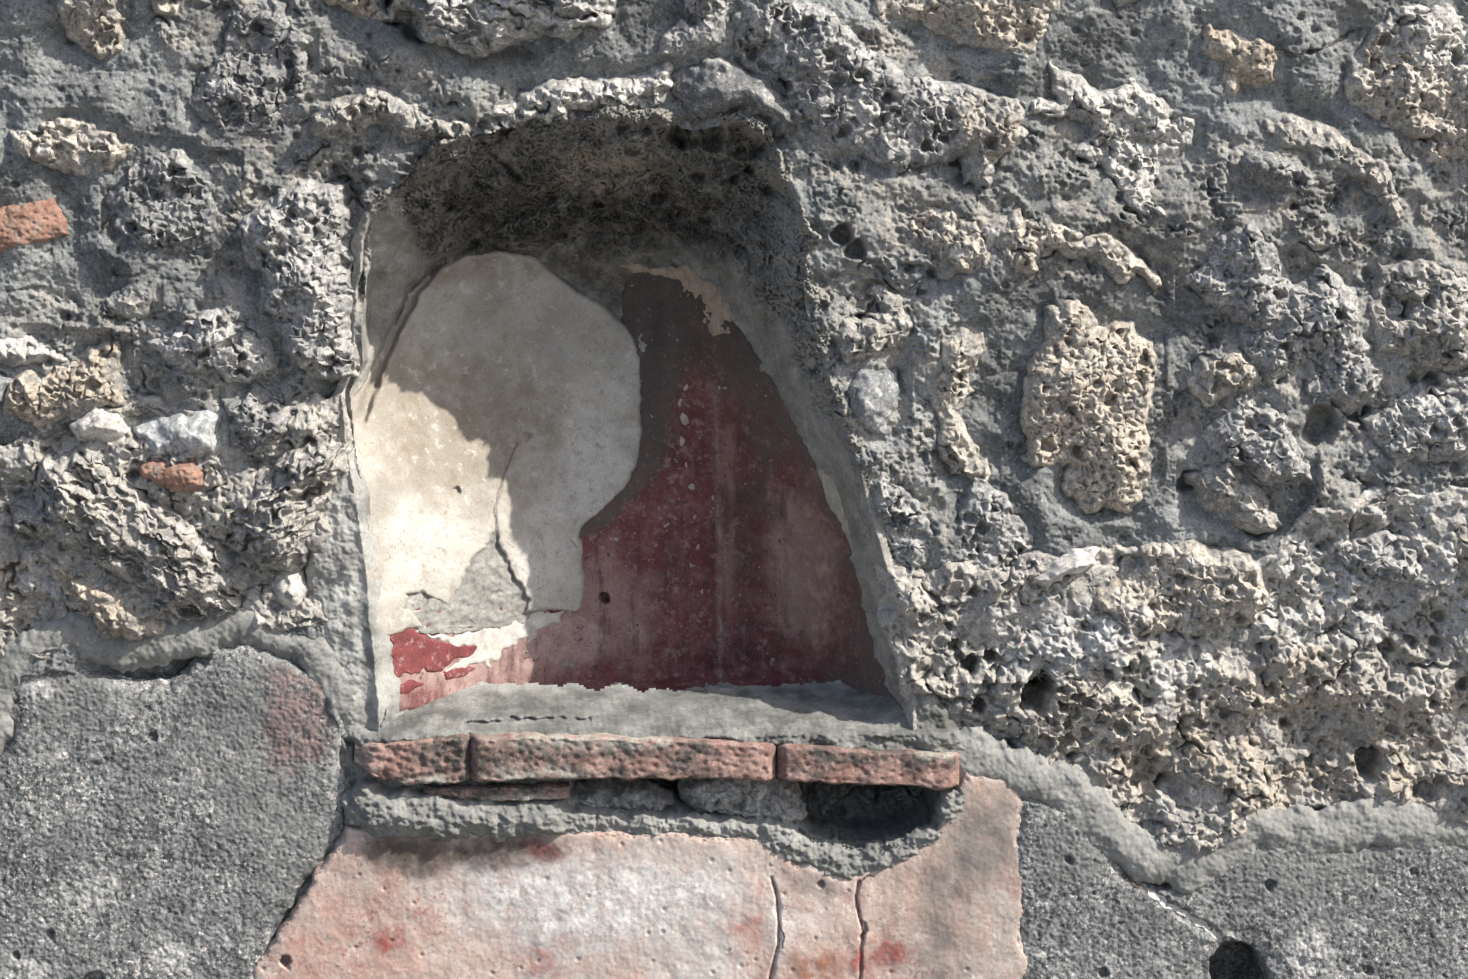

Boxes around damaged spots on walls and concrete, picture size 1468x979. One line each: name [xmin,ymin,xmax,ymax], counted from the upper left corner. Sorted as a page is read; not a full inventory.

spalling [570,527,583,551]
spalling [390,532,571,695]
crack [769,878,785,979]
crack [855,875,875,979]